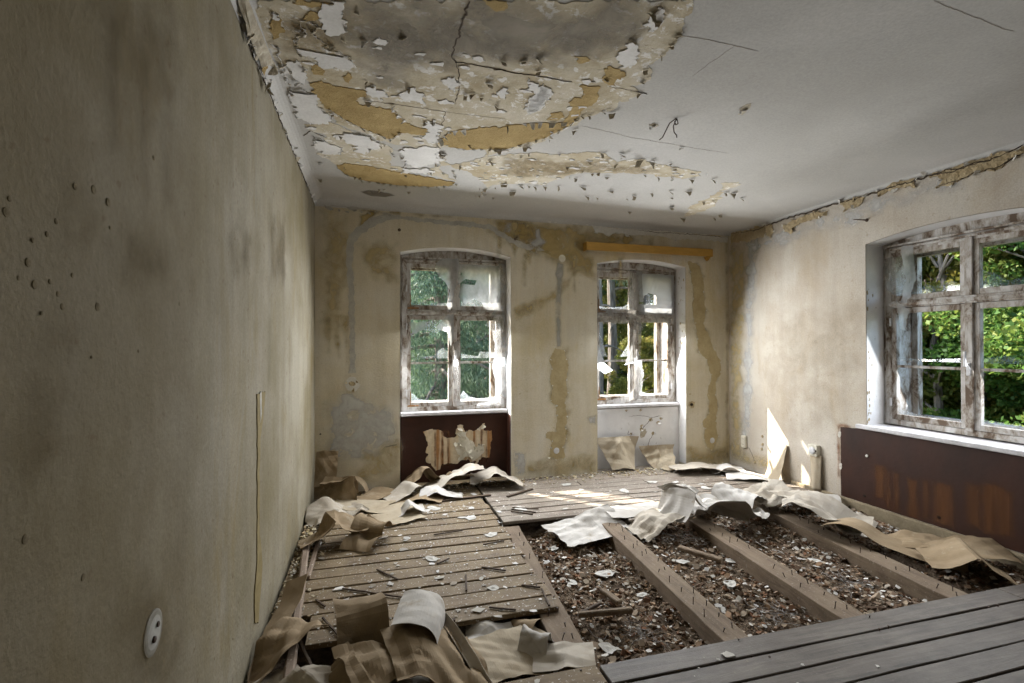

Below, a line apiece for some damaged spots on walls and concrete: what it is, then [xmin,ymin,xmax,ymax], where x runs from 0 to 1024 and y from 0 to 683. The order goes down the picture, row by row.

crack [365,1,569,138]
peeling [238,0,827,246]
flaking render [838,146,1024,212]
peeling [423,423,492,470]
peeling [546,347,569,459]
peeling [678,261,721,451]